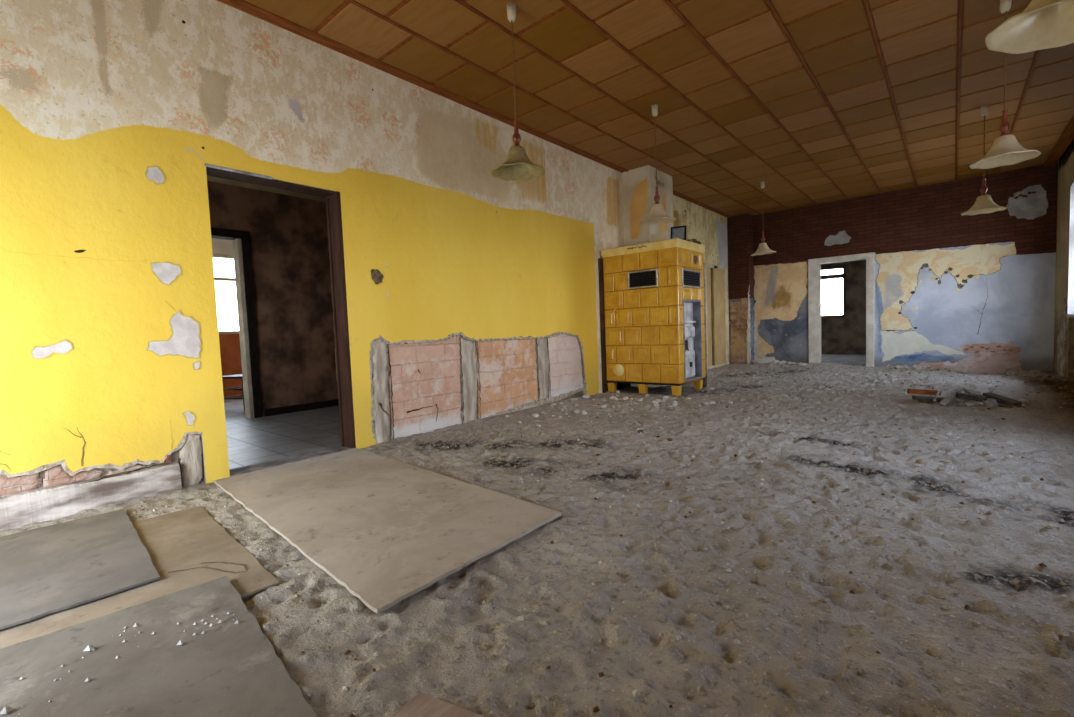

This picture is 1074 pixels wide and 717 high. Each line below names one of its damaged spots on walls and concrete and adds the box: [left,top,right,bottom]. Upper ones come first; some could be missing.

flaking render [1006,185,1048,219]
flaking render [825,230,851,246]
peeling [150,261,183,286]
peeling [30,339,74,360]
peeling [147,309,202,370]
peeling [746,262,808,364]
peeling [874,241,1023,373]
spalling [369,332,587,444]
spalling [0,410,203,531]